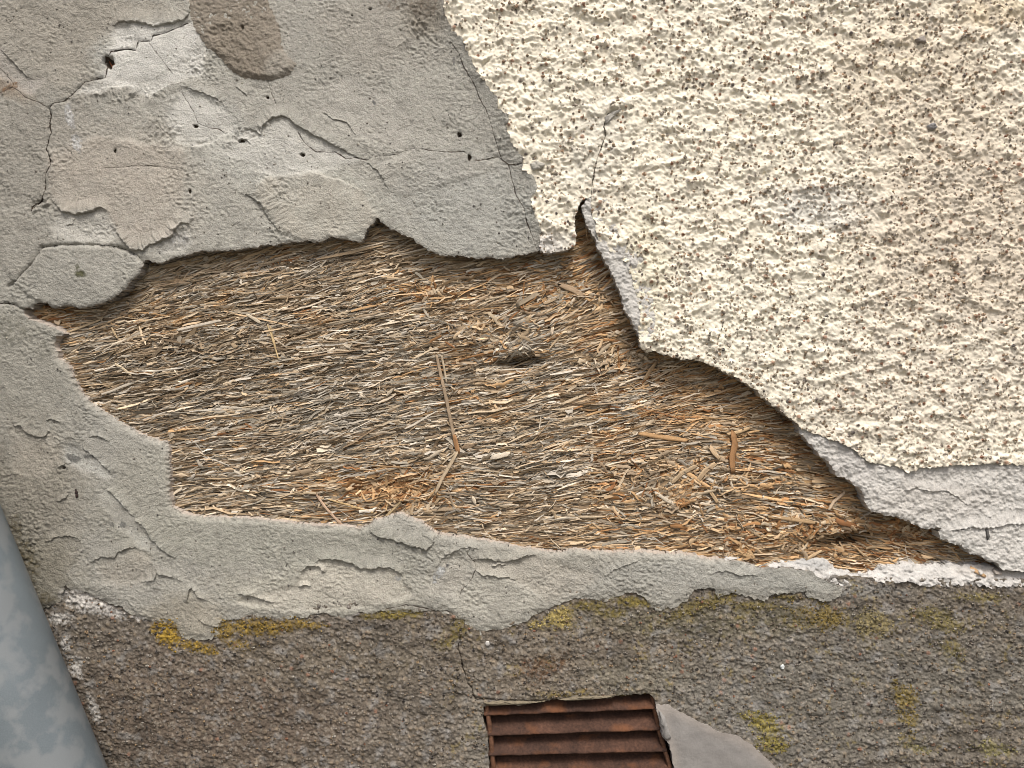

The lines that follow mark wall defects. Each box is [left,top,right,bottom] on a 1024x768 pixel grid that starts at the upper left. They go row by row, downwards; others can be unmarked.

crack [0,23,188,211]
crack [297,42,538,250]
spalling [24,197,1024,589]
peeling [42,429,226,627]